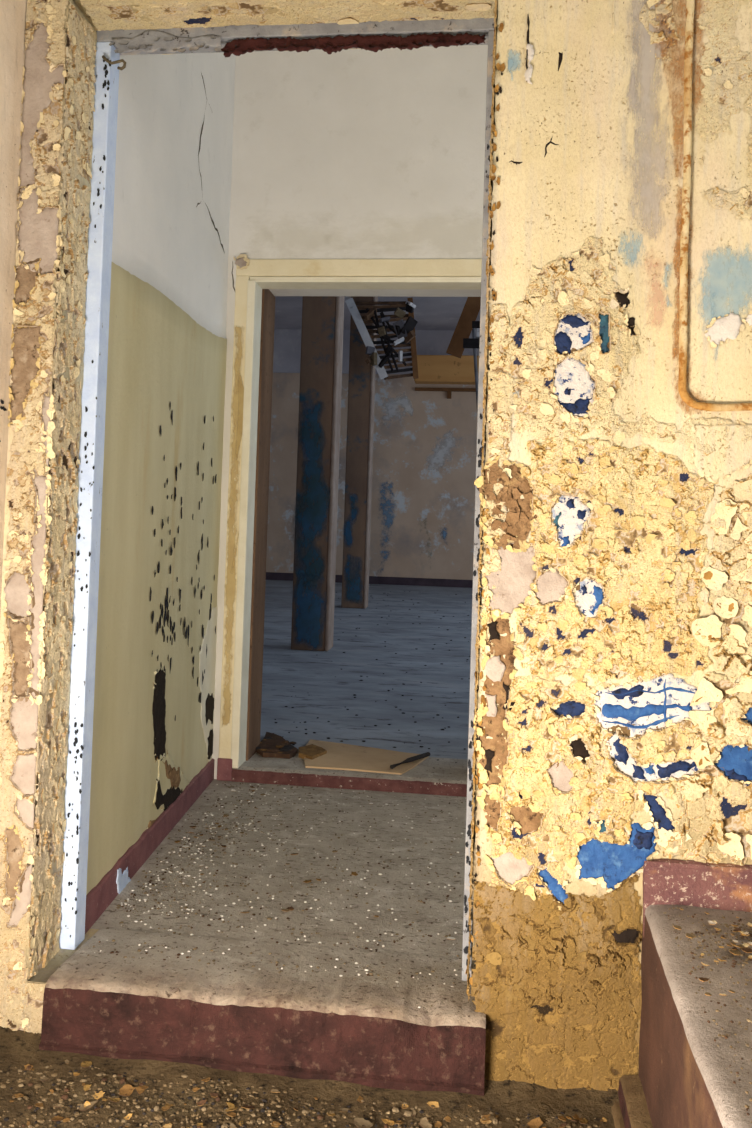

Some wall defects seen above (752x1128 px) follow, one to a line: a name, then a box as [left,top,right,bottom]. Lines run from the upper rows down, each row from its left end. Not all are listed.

peeling [639,0,680,66]
peeling [694,0,752,221]
peeling [704,310,752,348]
flaking render [146,455,218,829]